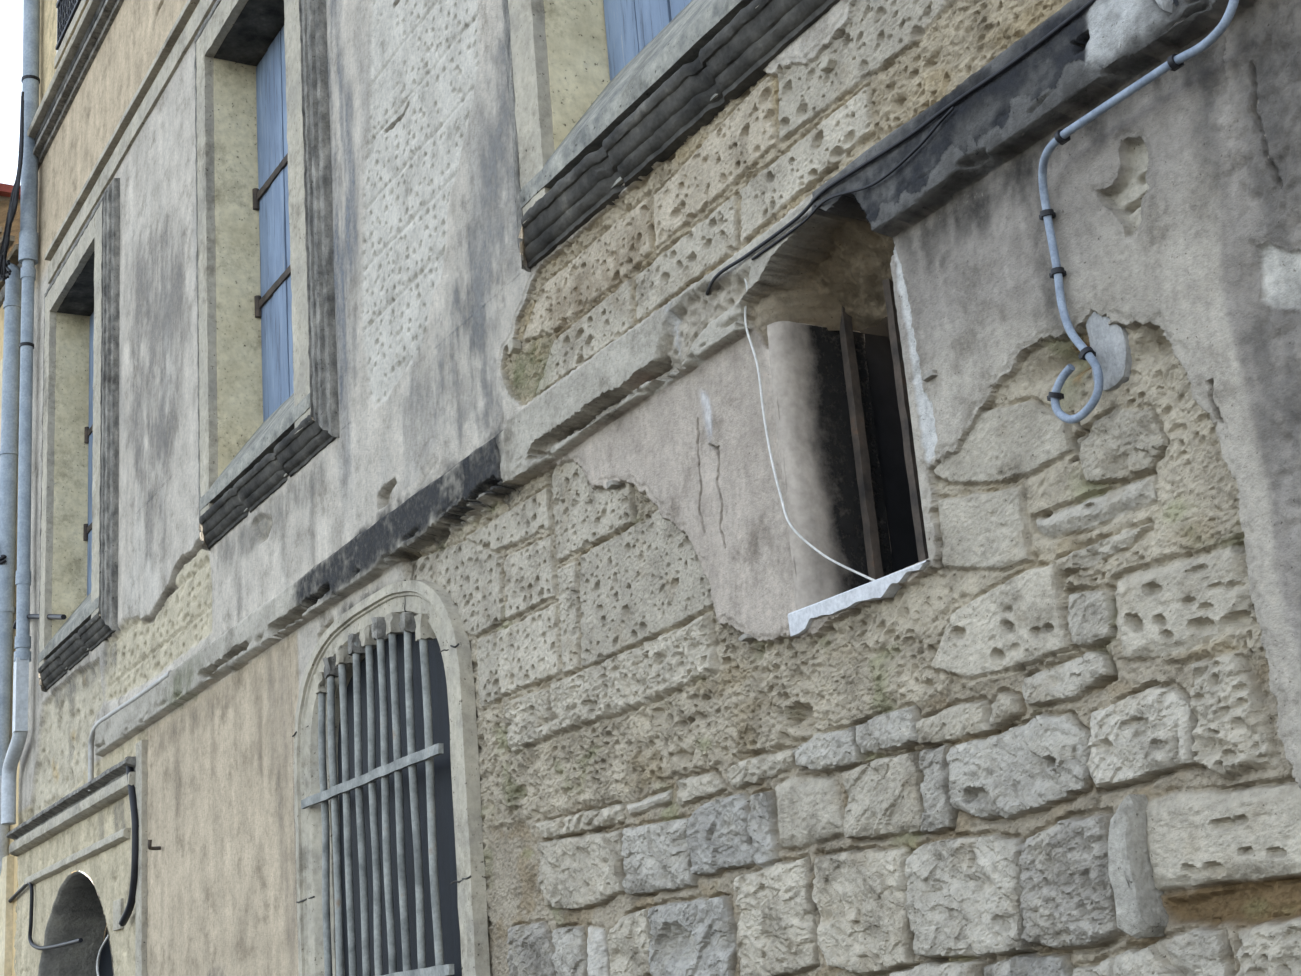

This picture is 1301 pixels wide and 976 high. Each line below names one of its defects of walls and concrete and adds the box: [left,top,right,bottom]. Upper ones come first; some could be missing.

spalling [359,0,480,409]
spalling [376,476,397,511]
crack [696,417,727,550]
spalling [387,0,1301,976]
spalling [28,549,213,819]